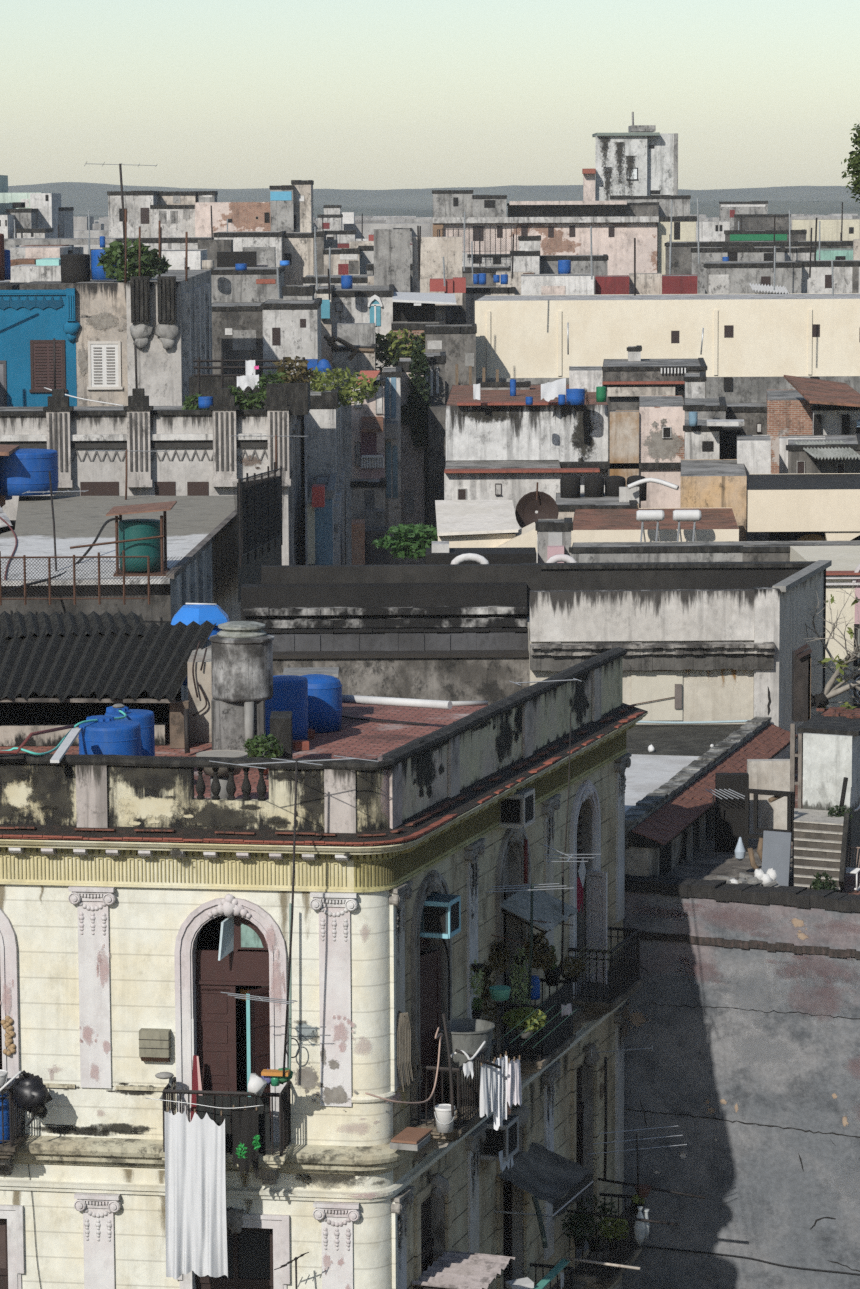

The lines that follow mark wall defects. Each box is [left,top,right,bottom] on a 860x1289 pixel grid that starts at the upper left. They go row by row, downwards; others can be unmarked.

water stain [461,405,516,423]
water stain [572,388,594,462]
water stain [570,673,590,726]
water stain [474,707,522,763]
water stain [0,763,74,826]
water stain [356,770,374,810]
water stain [414,740,448,798]
peeling [97,946,110,986]
peeling [79,1026,111,1053]
flaking render [294,1016,357,1111]